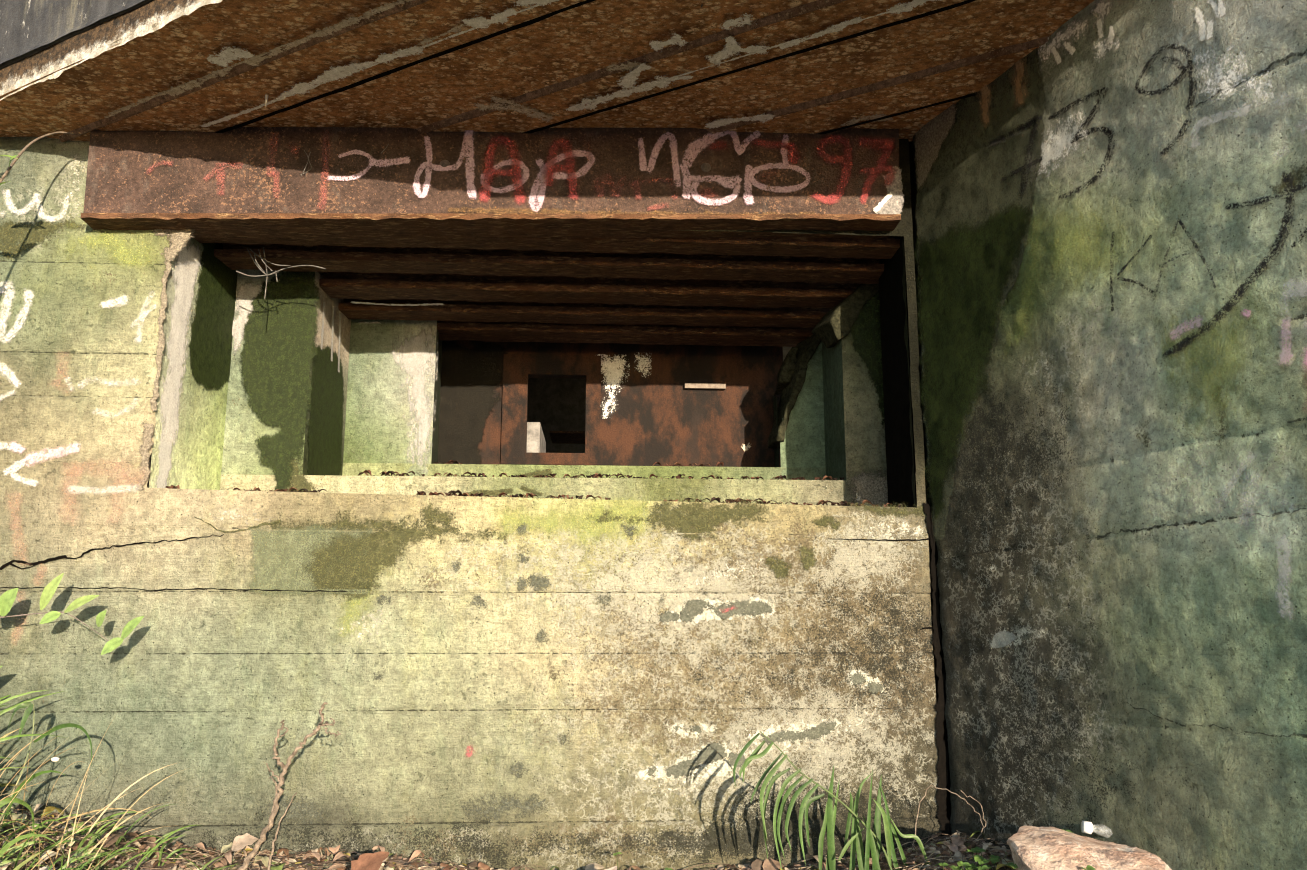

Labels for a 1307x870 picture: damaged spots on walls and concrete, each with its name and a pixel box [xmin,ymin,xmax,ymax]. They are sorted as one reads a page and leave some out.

peeling [105,0,415,118]
peeling [200,0,559,127]
peeling [473,0,941,122]
peeling [704,113,775,129]
water stain [188,243,344,492]
crack [1099,508,1306,538]
crack [0,534,356,592]
water stain [249,503,506,641]
spalling [656,593,776,625]
spalling [635,715,841,784]
crack [1127,702,1307,738]